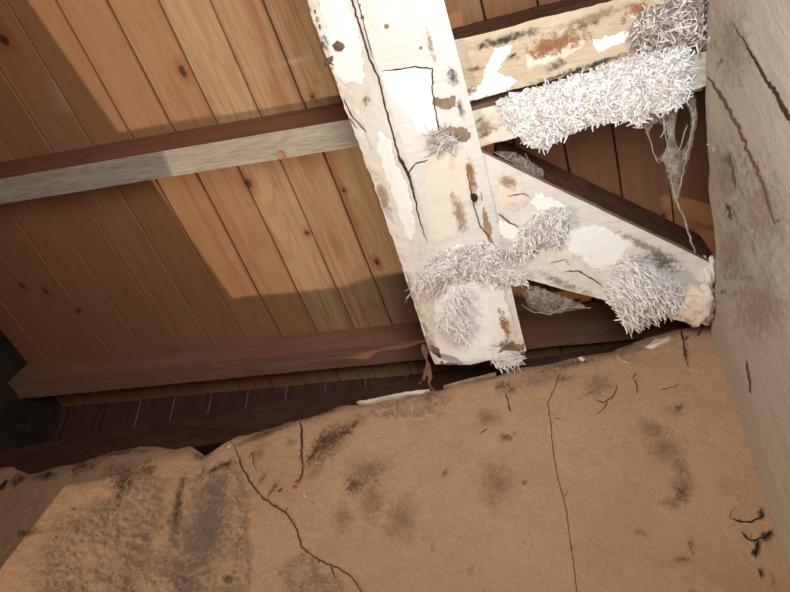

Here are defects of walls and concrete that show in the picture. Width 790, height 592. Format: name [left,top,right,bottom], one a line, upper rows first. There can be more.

peeling [432,96,456,110]
peeling [446,126,471,144]
crack [707,77,776,225]
crack [732,23,790,121]
peeling [480,193,495,243]
peeling [430,345,459,365]
peeling [498,341,525,353]
crack [744,361,752,396]
crack [292,421,317,514]
crack [547,366,577,592]
crack [228,441,362,592]
crack [729,506,773,577]